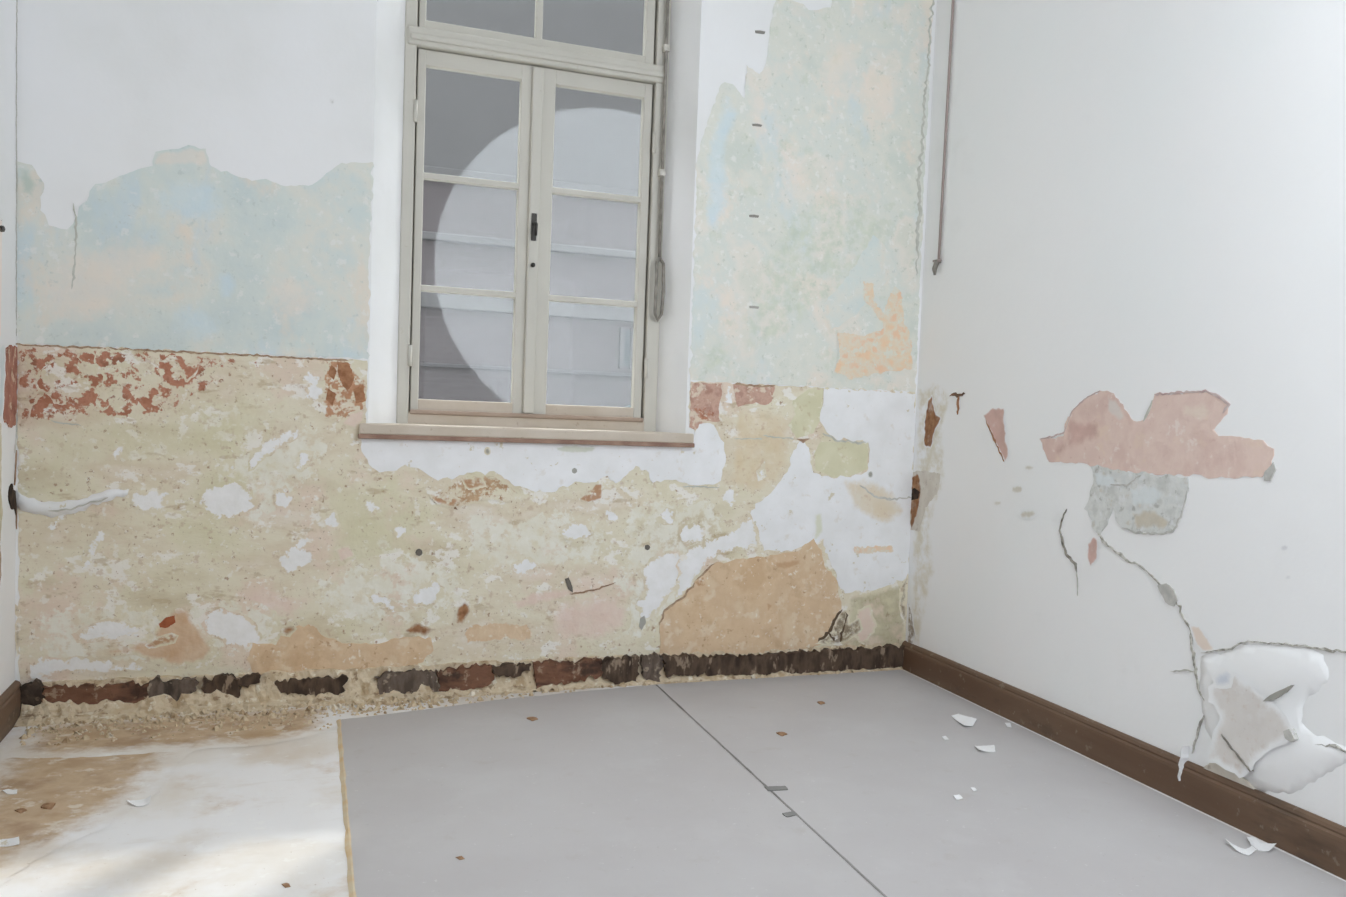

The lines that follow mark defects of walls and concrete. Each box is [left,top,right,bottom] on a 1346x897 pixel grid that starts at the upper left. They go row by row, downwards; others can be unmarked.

peeling [0,0,940,686]
spalling [1040,389,1277,535]
crack [1059,509,1346,772]